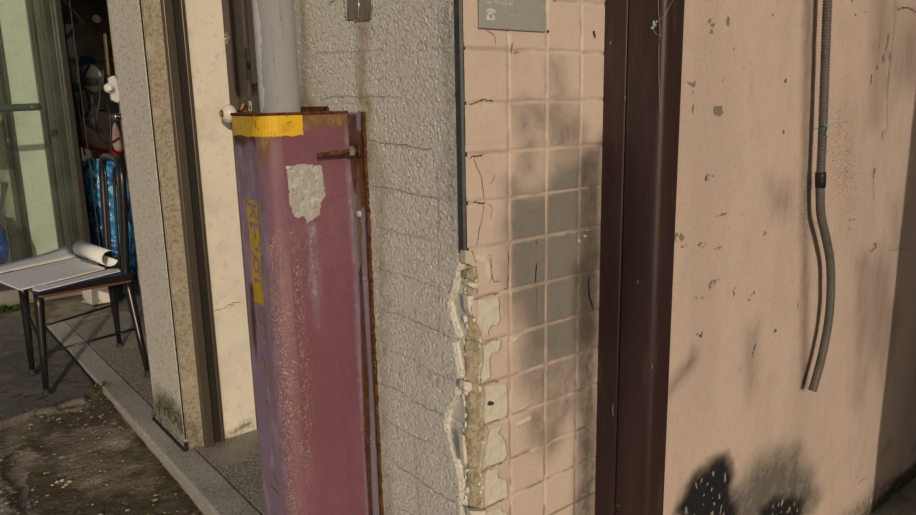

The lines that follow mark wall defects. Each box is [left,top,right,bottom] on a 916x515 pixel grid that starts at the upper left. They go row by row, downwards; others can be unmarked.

rust [230,91,384,515]
crack [470,153,509,290]
spalling [447,250,533,515]